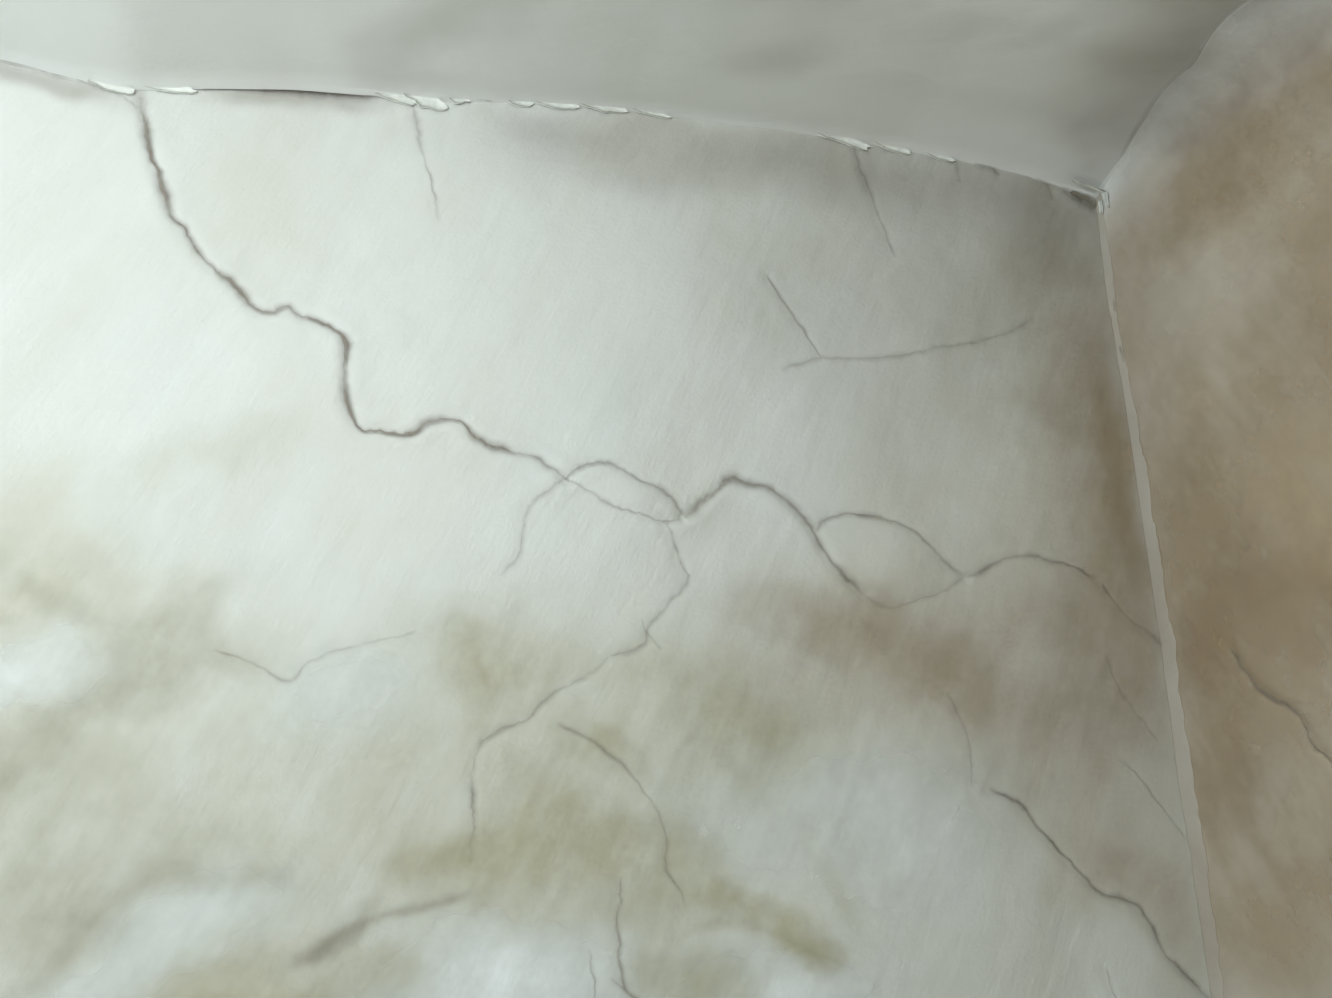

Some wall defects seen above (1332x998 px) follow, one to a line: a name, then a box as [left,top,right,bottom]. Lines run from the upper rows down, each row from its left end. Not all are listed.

crack [261,89,366,97]
crack [1071,191,1095,207]
crack [143,117,509,451]
damp [1154,150,1332,760]
crack [665,476,820,545]
crack [1232,651,1329,759]
crack [999,793,1157,938]
damp [393,927,594,998]
damp [679,959,855,998]